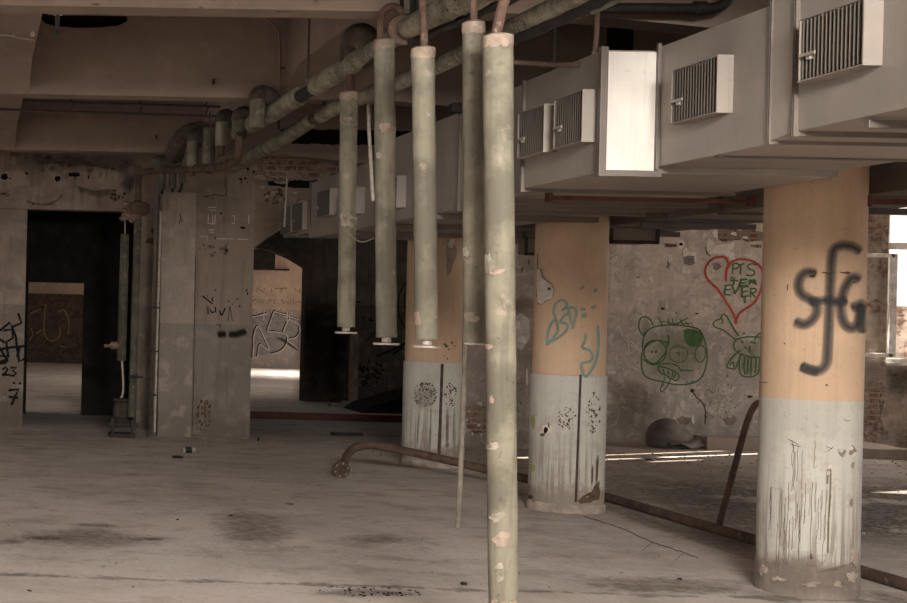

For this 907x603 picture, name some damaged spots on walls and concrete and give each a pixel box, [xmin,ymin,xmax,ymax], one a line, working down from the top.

flaking render [239,157,350,205]
peeling [536,254,554,305]
flaking render [868,382,907,431]
flaking render [759,548,860,591]